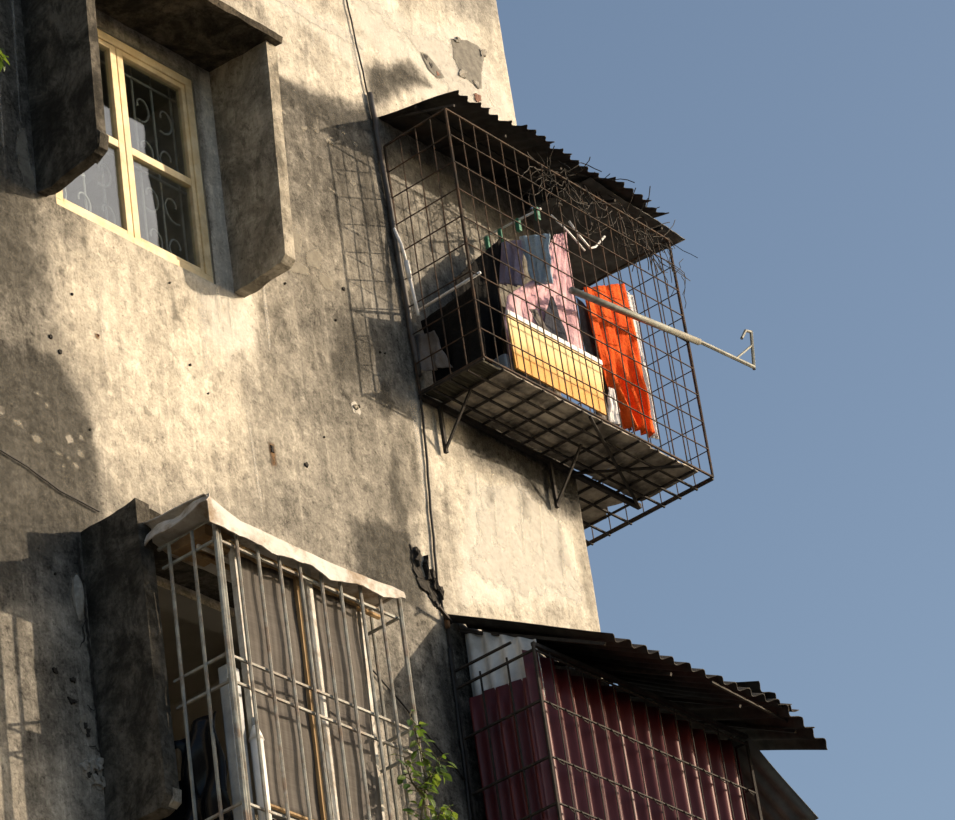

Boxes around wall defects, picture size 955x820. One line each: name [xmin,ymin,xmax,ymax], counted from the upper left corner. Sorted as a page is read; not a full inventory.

spalling [421,52,444,78]
spalling [452,36,487,103]
peeling [412,547,444,600]